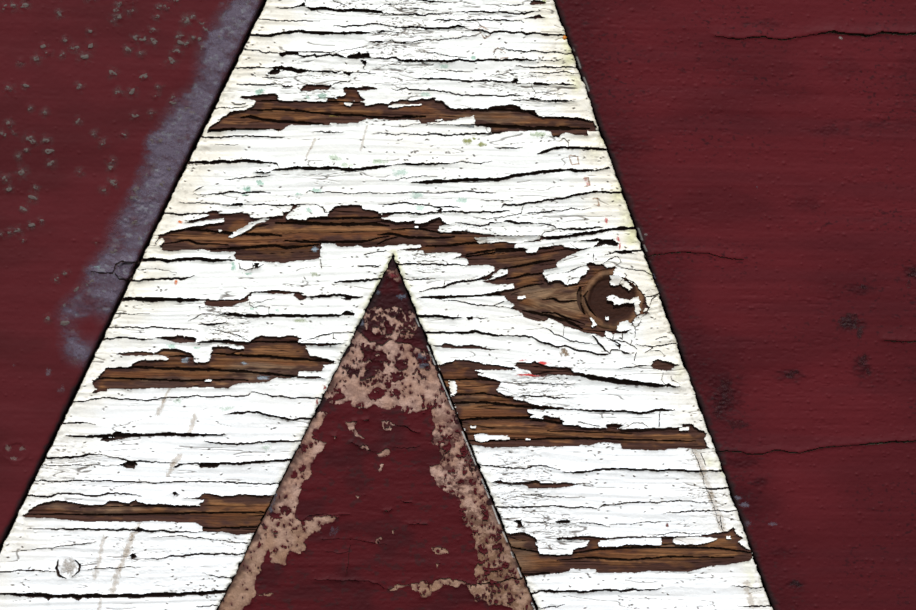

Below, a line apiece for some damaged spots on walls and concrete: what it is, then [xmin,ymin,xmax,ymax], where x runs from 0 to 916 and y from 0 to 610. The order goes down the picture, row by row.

peeling [525,0,546,19]
crack [716,30,916,41]
peeling [202,84,598,137]
peeling [152,204,650,337]
peeling [17,305,752,610]
crack [479,440,916,536]